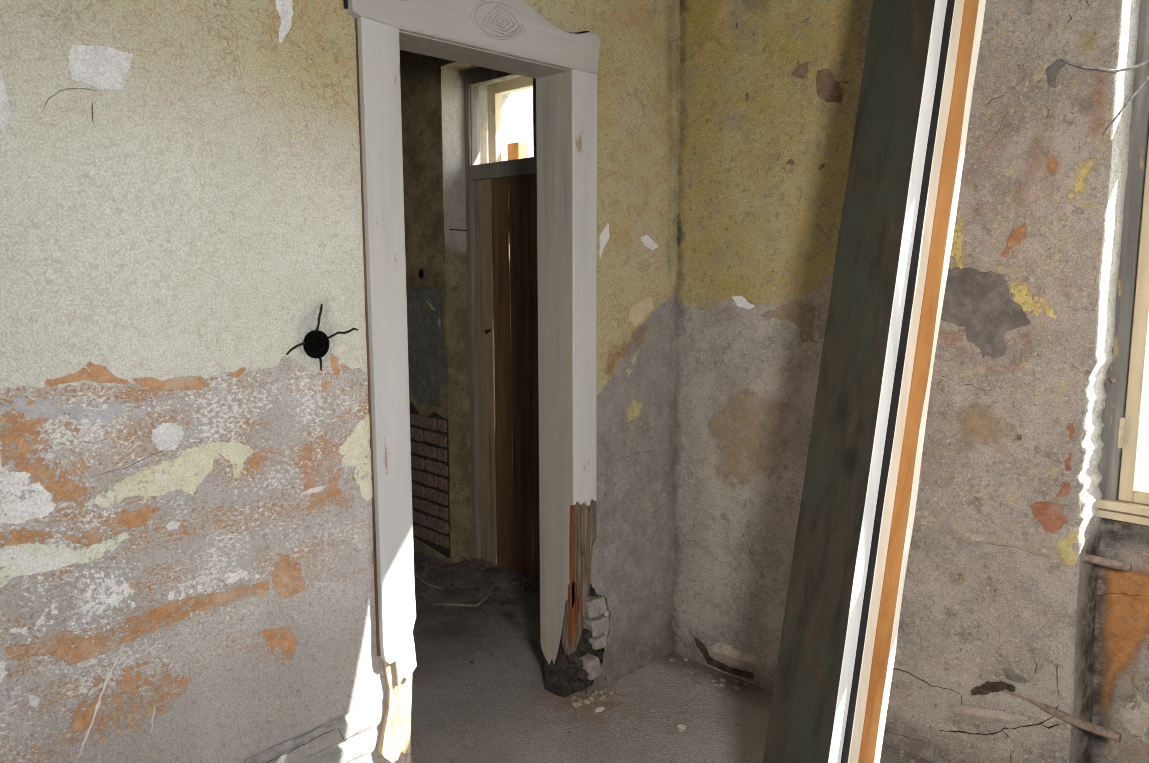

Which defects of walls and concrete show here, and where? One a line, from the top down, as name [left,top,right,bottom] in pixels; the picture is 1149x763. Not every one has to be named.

peeling [275,0,294,44]
peeling [0,69,11,132]
peeling [68,45,133,90]
flaking render [941,209,1058,359]
peeling [0,362,305,682]
peeling [286,415,373,513]
flaking render [1027,423,1085,566]
peeling [29,694,41,708]
flaking render [68,661,192,747]
flaking render [244,717,354,763]
crack [884,662,1059,763]